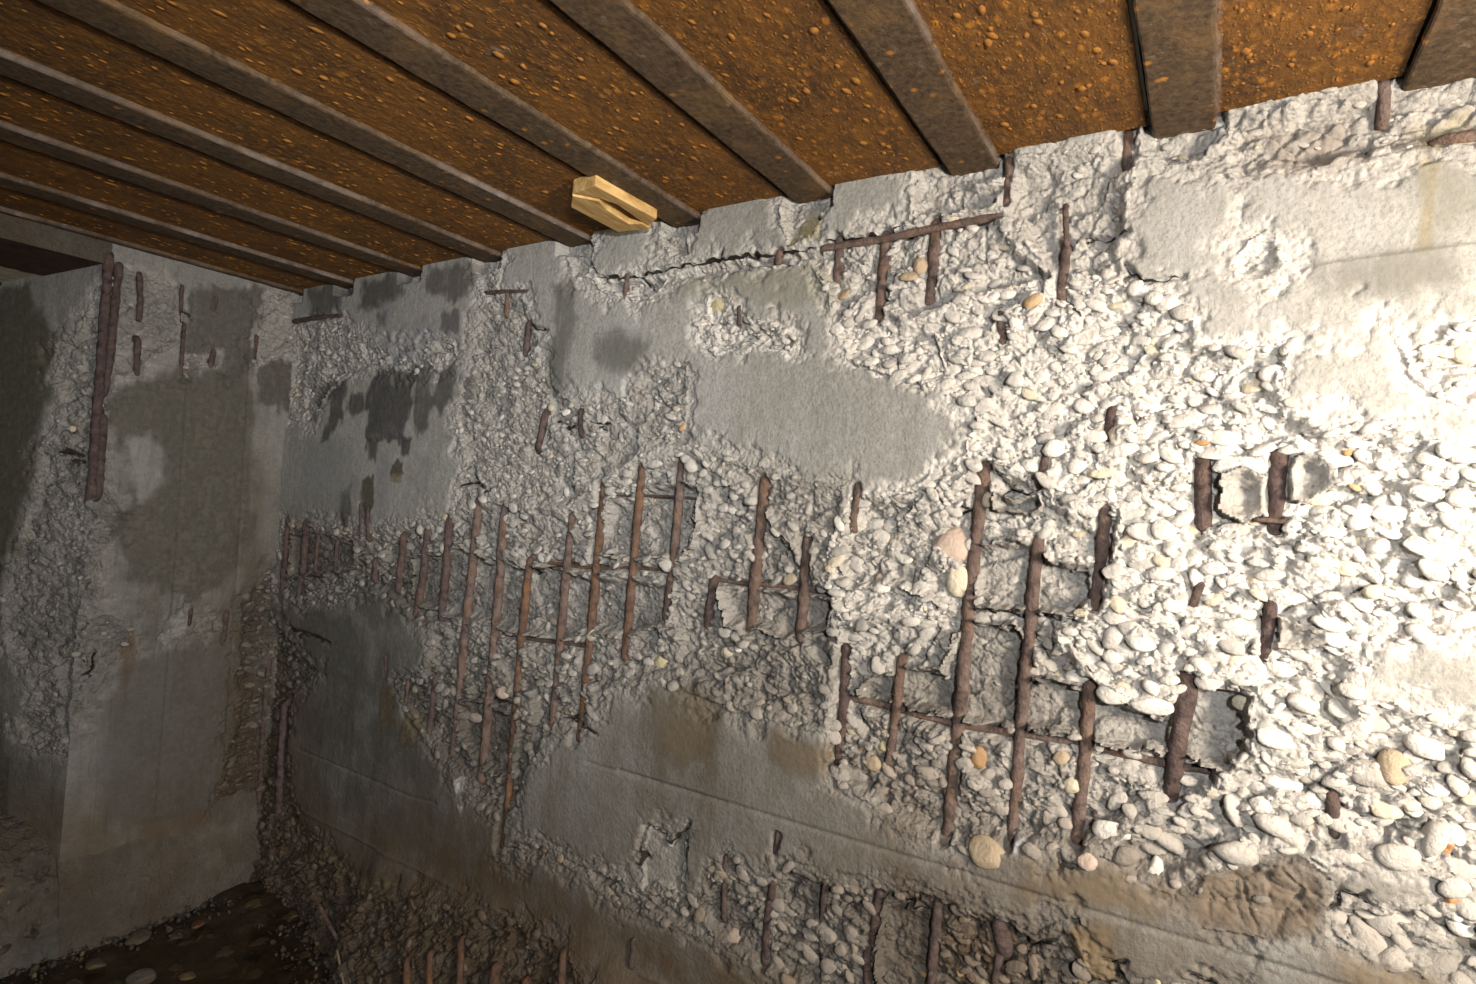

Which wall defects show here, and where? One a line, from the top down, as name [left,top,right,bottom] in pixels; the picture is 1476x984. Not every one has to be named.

crack [591,226,919,291]
spalling [0,252,222,754]
leakage [308,262,476,527]
spalling [208,78,1476,984]
rust [380,687,427,746]